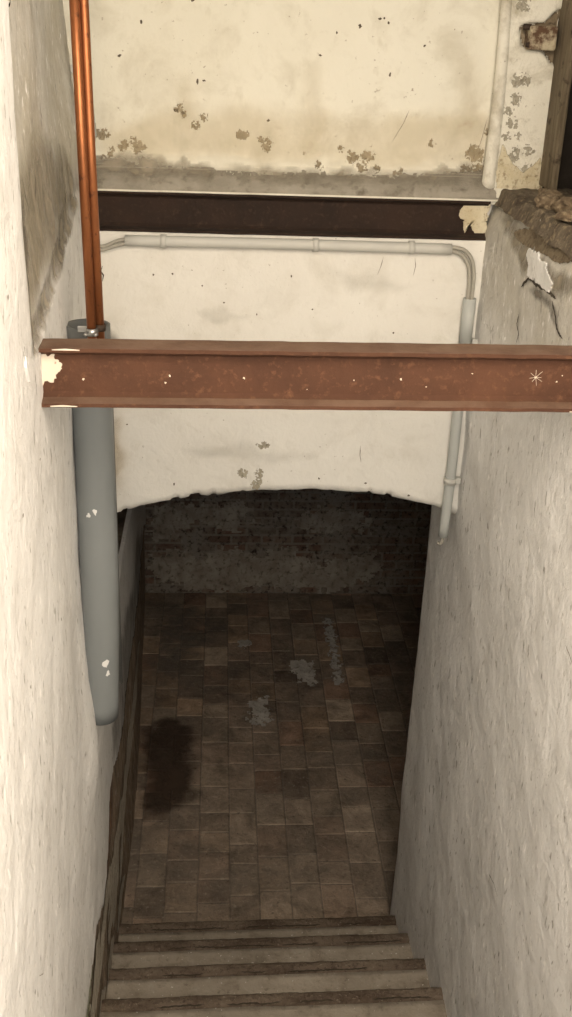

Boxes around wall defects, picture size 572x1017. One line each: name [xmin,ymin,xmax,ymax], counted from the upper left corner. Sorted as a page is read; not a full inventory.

peeling [516,0,531,12]
leakage [96,156,212,176]
spalling [514,228,572,264]
leakage [144,719,192,809]